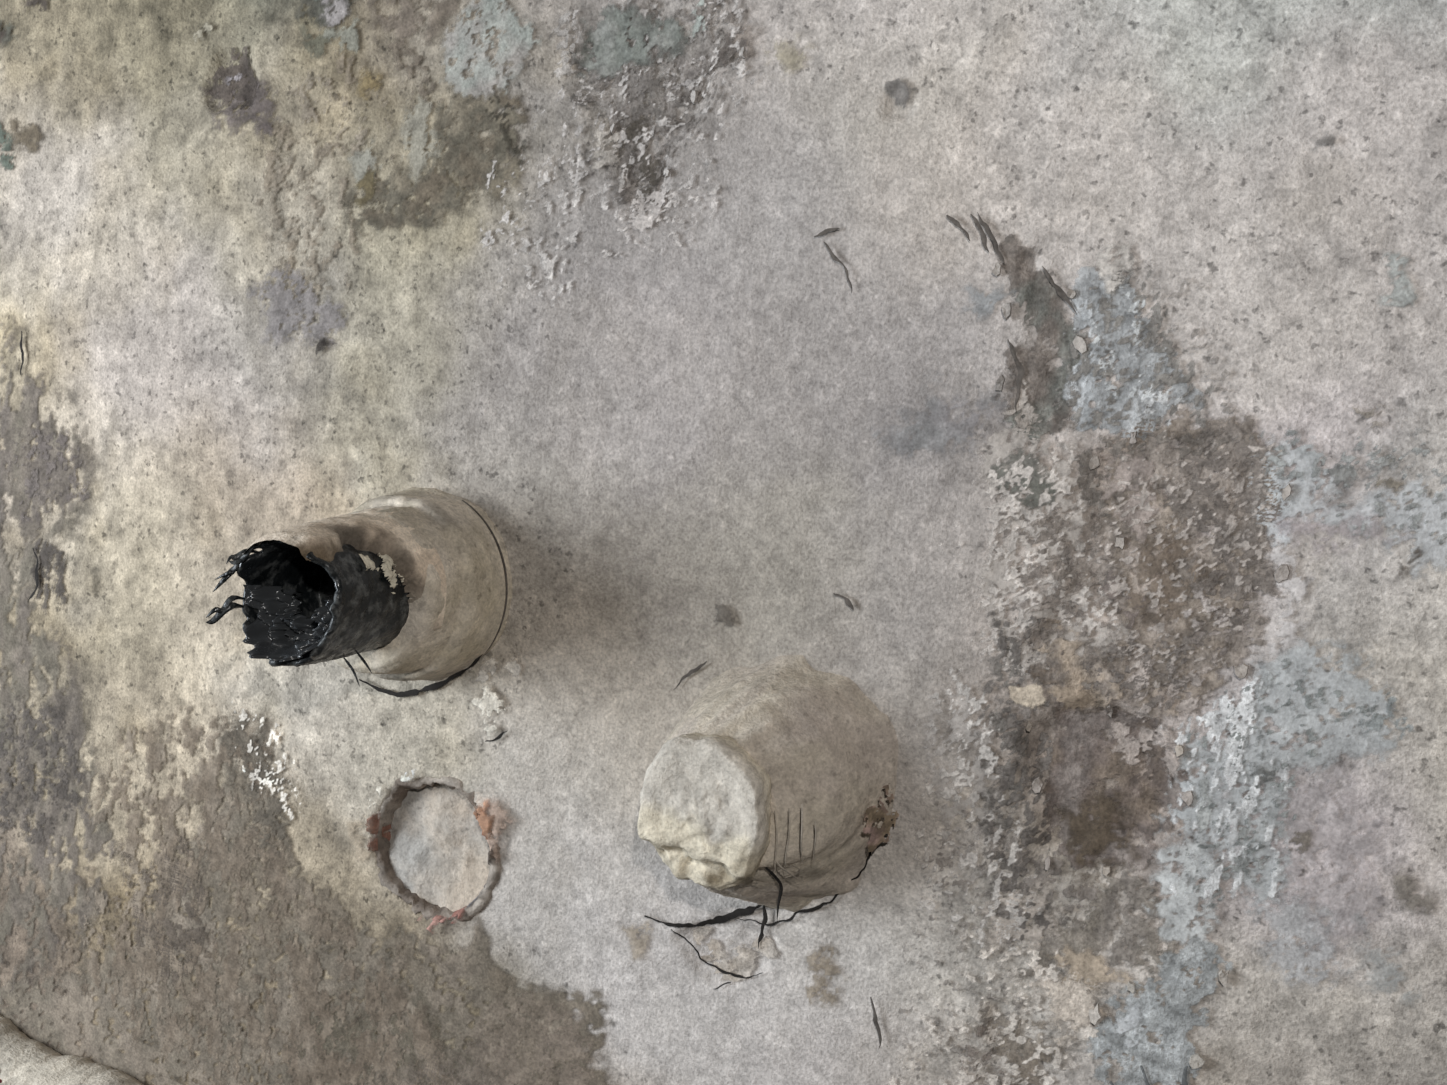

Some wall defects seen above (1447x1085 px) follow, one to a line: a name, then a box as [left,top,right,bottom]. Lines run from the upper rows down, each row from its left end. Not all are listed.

water stain [26,0,47,11]
water stain [296,0,350,57]
water stain [0,119,42,170]
water stain [341,40,527,237]
water stain [0,332,607,1085]
water stain [1147,407,1447,965]
water stain [888,424,1146,1085]
rust [347,814,394,861]
rust [473,801,511,858]